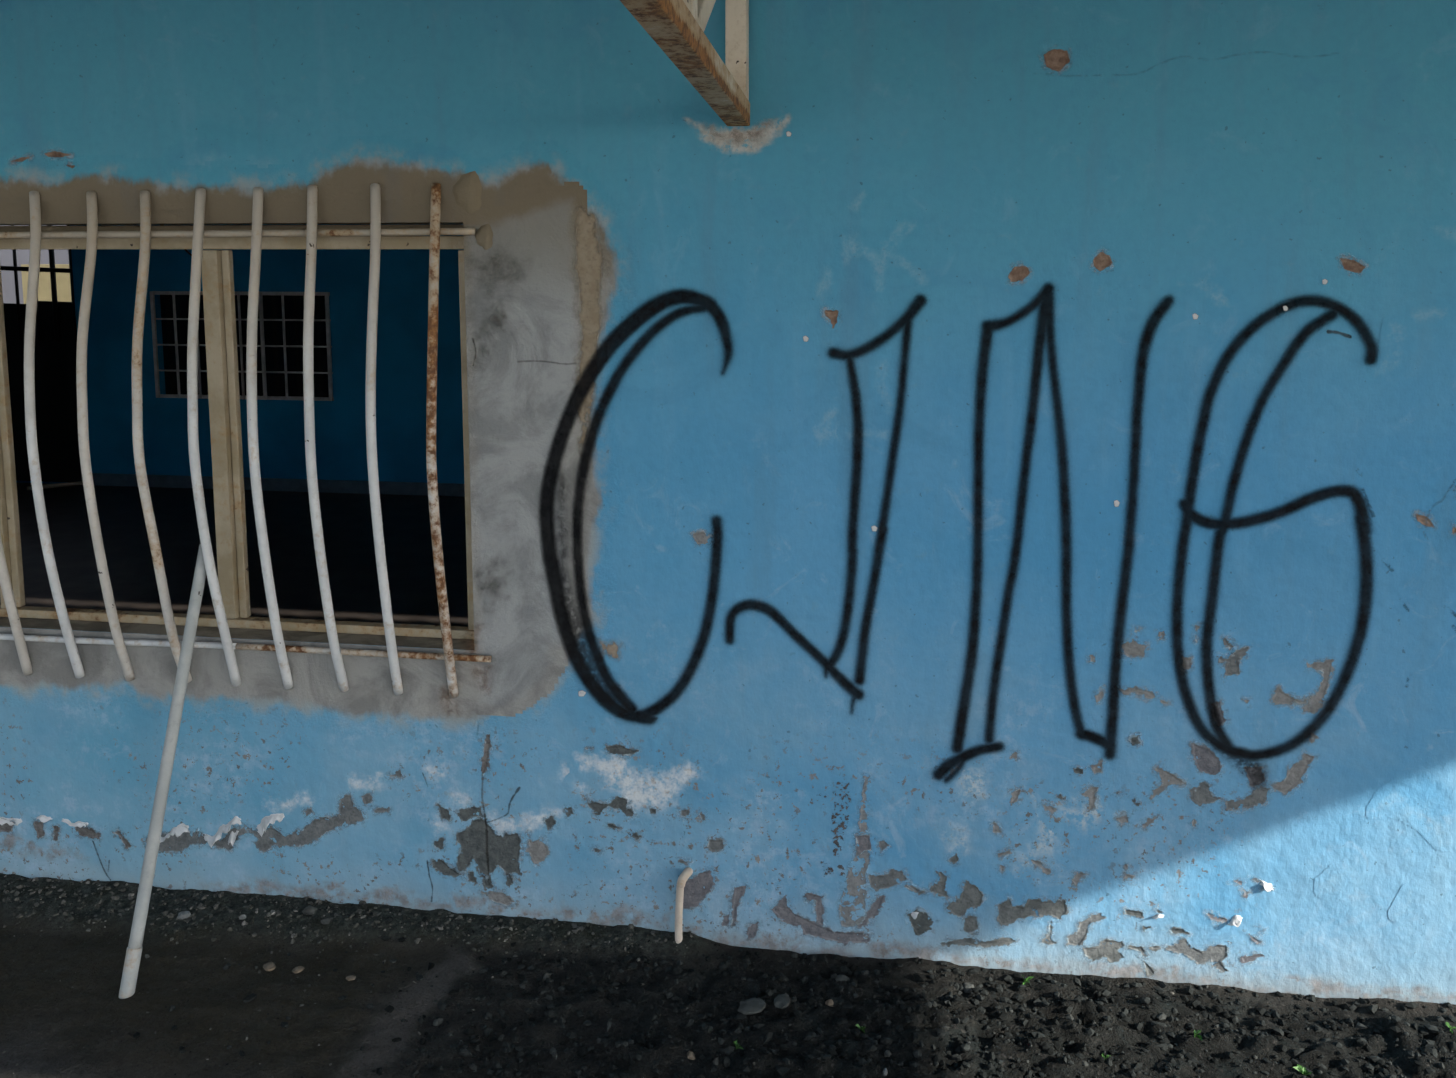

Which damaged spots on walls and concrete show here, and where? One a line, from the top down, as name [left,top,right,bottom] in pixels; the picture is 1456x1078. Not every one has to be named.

spalling [1043,49,1070,73]
spalling [1008,264,1031,283]
peeling [1217,637,1249,676]
peeling [1269,659,1334,714]
peeling [585,743,639,756]
peeling [0,793,390,853]
crack [480,734,520,885]
peeling [431,796,656,908]
peeling [678,837,726,909]
peeling [721,776,1266,977]
peeling [1114,734,1319,829]
peeling [1234,878,1274,898]